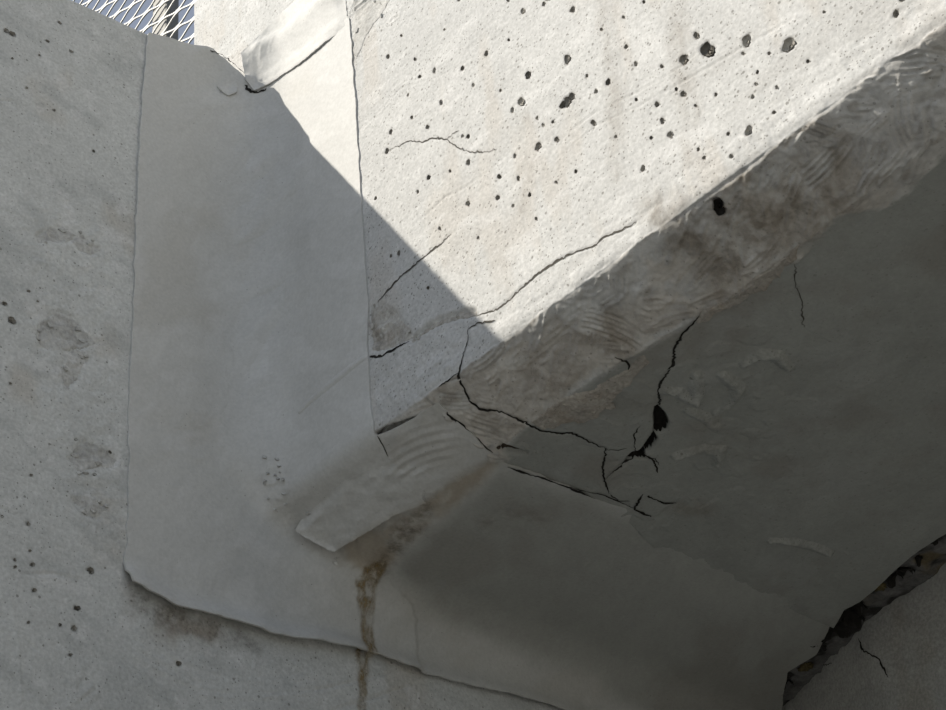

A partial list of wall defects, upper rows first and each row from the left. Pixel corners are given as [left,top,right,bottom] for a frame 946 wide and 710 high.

crack [378,234,451,302]
crack [370,341,409,358]
crack [439,222,700,517]
corrosion [356,563,383,690]
crack [858,638,888,677]